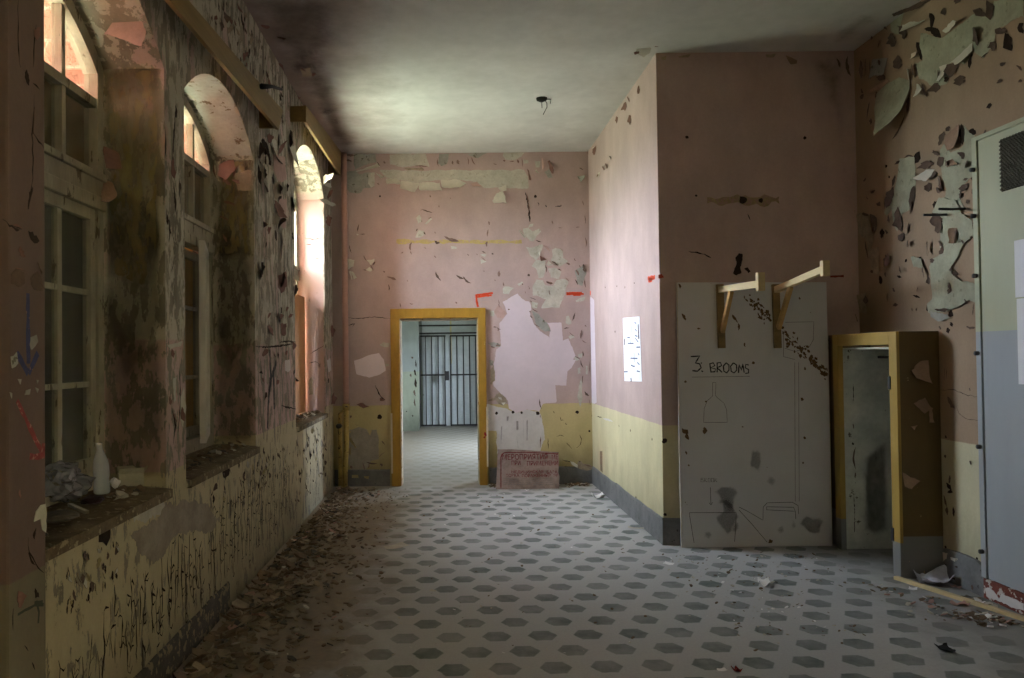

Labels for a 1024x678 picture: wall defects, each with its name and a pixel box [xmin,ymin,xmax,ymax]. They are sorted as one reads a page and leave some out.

peeling [104,21,146,46]
peeling [873,0,1024,138]
damp [108,69,159,288]
damp [219,160,249,255]
peeling [347,152,554,264]
peeling [855,124,986,333]
flaking render [487,342,545,454]
peeling [489,223,590,414]
peeling [911,360,933,384]
flaking render [131,423,327,564]
peeling [942,546,1024,611]